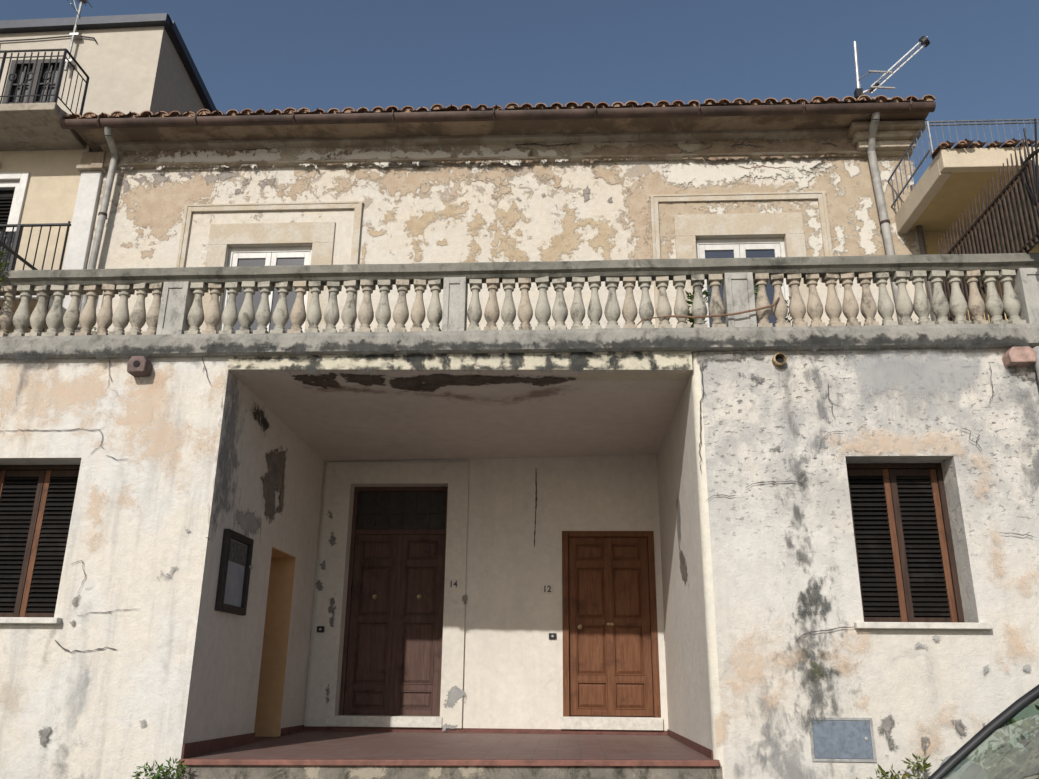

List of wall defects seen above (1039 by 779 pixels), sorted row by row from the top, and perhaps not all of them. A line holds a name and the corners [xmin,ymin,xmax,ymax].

flaking render [110,145,929,264]
leakage [308,355,322,374]
leakage [407,354,424,370]
leakage [508,353,524,369]
leakage [570,352,592,372]
crack [5,426,126,460]
flaking render [260,446,288,523]
leakage [778,436,825,524]
crack [72,560,140,616]
crack [55,640,117,653]
leakage [760,536,849,779]
spalling [444,685,465,708]